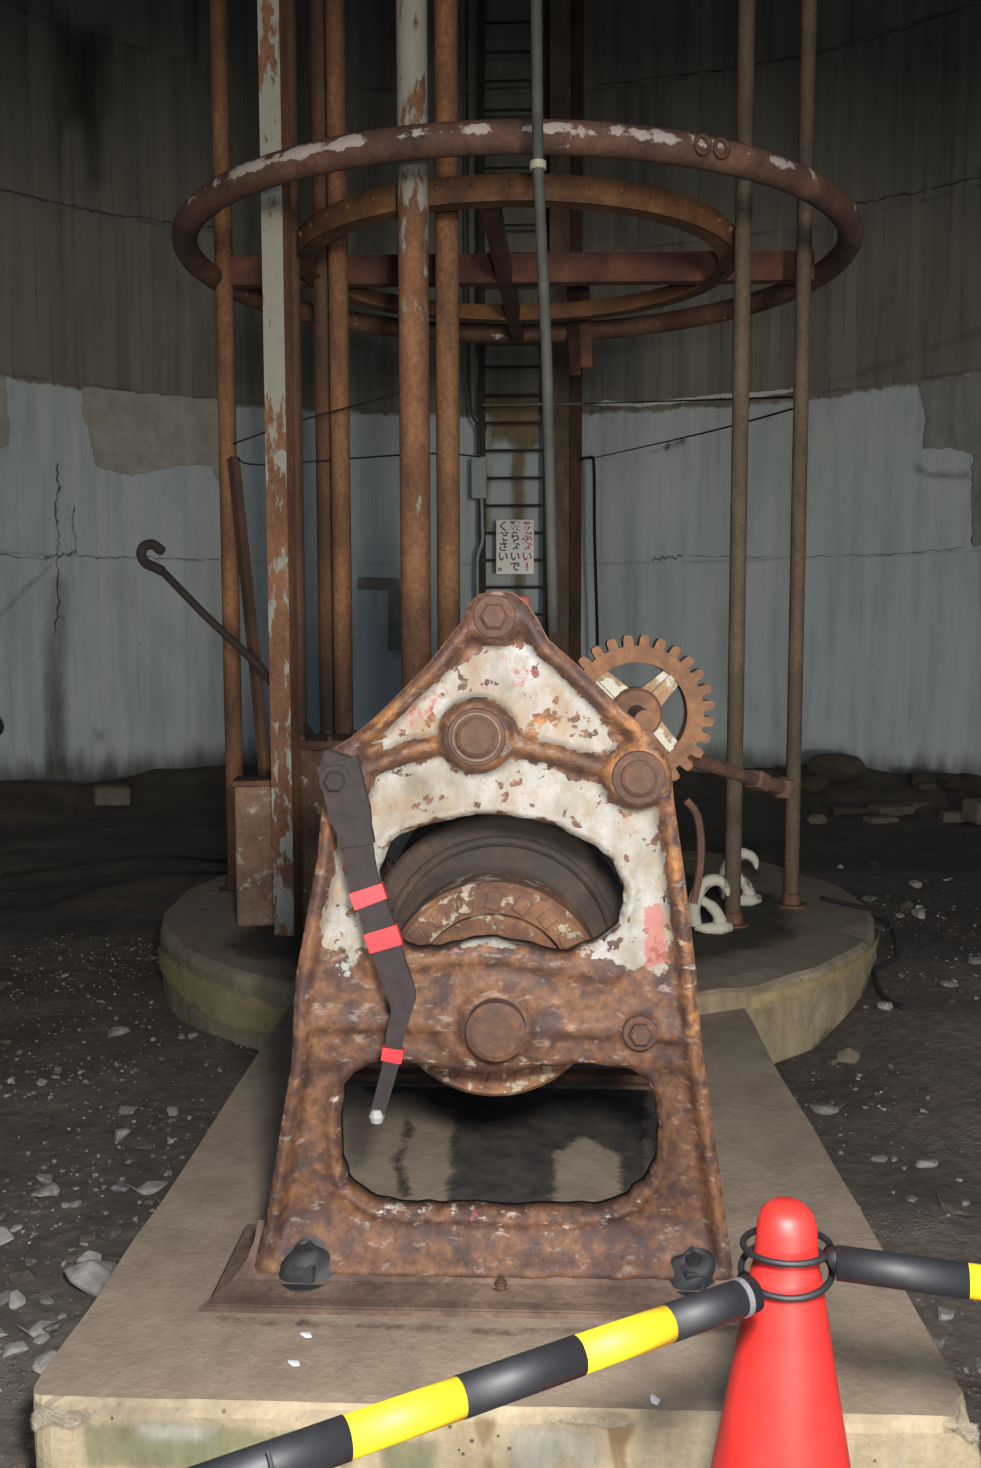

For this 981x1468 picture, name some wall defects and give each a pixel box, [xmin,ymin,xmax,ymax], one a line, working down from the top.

peeling [0,376,10,449]
peeling [82,386,219,482]
peeling [918,371,981,547]
crack [0,463,220,636]